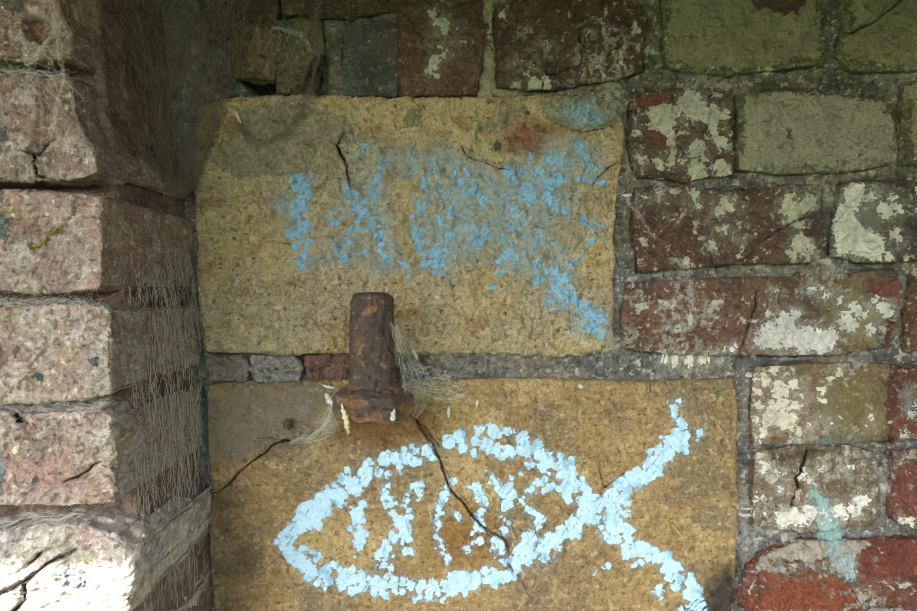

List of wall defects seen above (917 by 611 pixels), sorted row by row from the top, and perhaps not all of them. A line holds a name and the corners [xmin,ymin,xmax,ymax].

crack [211,430,313,494]
crack [410,415,533,602]
crack [789,450,807,509]
crack [0,552,73,611]